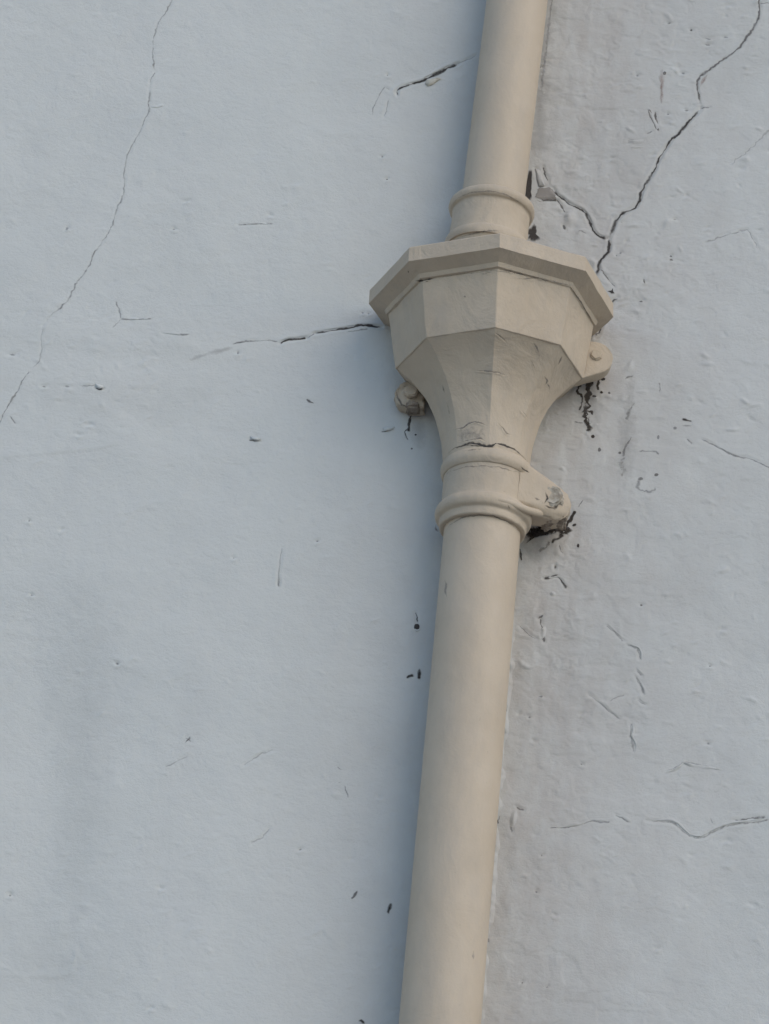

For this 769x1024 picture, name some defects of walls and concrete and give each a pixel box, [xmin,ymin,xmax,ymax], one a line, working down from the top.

crack [397,62,458,94]
crack [555,0,760,285]
spalling [525,168,557,202]
crack [121,316,190,335]
crack [278,322,382,344]
crack [550,814,769,837]